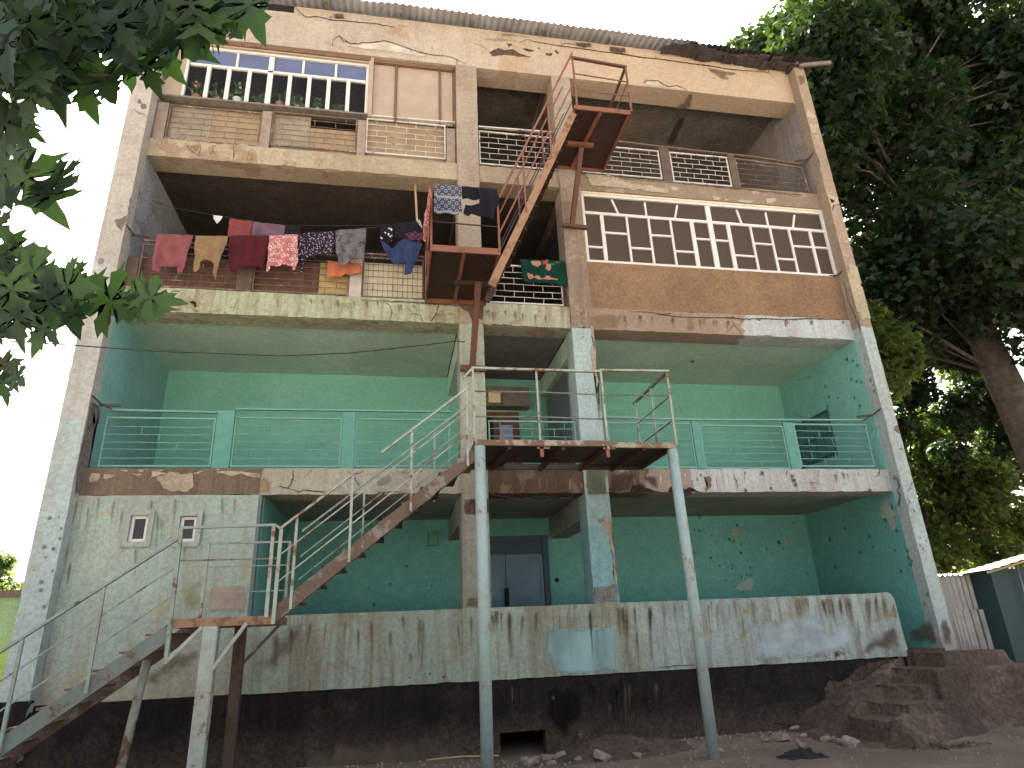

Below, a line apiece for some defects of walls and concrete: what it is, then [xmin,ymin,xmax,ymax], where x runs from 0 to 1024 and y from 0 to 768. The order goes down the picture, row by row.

crack [298,10,487,64]
flaking render [489,43,559,57]
spalling [75,401,260,494]
crack [279,469,325,494]
spalling [629,474,712,493]
flaking render [594,517,618,604]
corrosion [492,611,538,646]
corrosion [618,608,638,648]
damp [307,743,474,767]